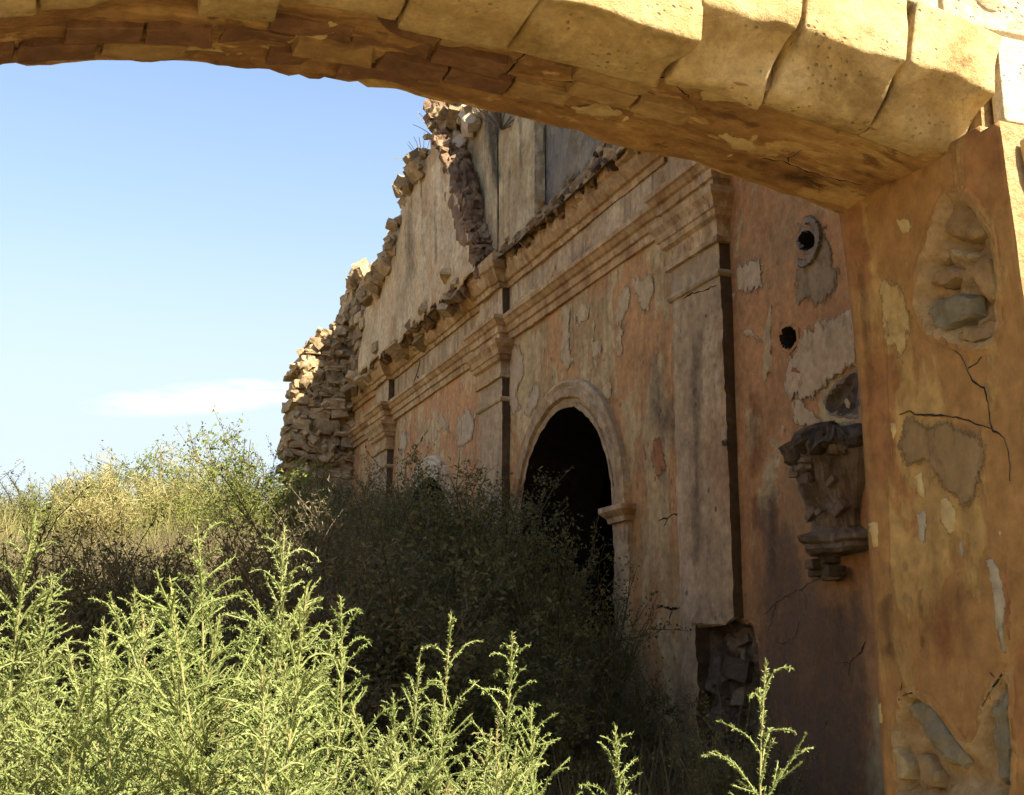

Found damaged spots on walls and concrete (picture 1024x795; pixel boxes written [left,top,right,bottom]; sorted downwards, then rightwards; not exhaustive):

flaking render [718,133,758,157]
flaking render [399,409,476,461]
flaking render [610,273,664,356]
flaking render [643,437,672,484]
flaking render [732,254,764,300]
flaking render [781,309,861,434]
flaking render [890,410,985,557]
spalling [878,185,1003,362]
crack [949,351,1011,481]
spalling [705,618,769,763]
spalling [878,558,1018,795]